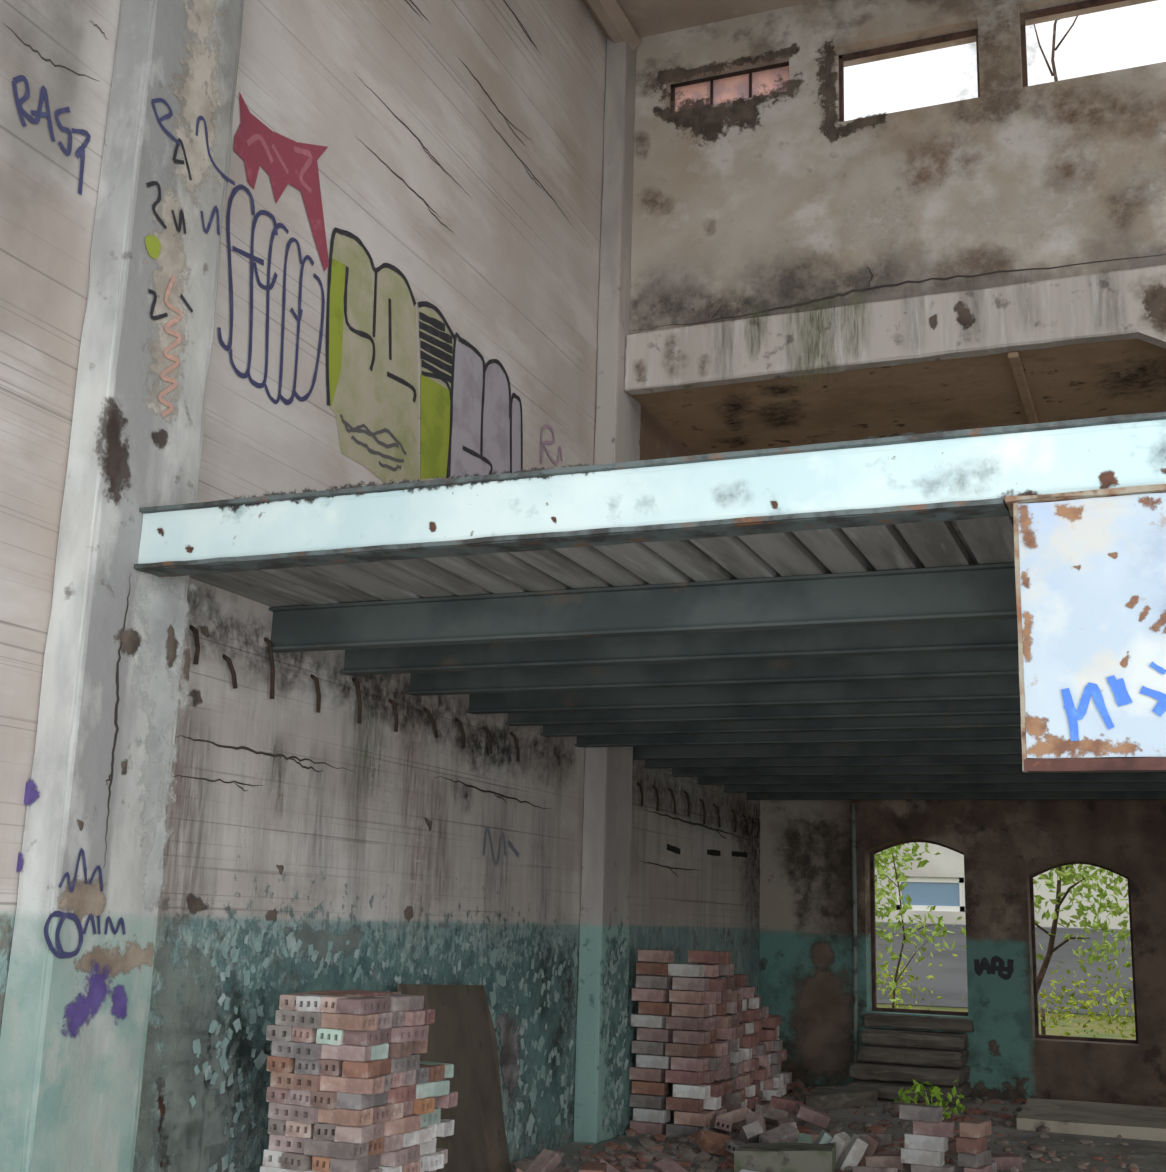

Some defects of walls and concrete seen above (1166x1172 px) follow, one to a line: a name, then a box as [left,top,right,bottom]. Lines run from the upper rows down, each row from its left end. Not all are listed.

peeling [144,0,222,422]
crack [633,254,1166,331]
rust [1098,471,1118,489]
rust [1003,490,1038,549]
rust [1056,504,1083,521]
rust [1139,496,1161,509]
rust [1022,611,1033,662]
rust [1126,596,1166,633]
rust [1025,714,1142,758]
peeling [74,575,578,1172]
peeling [58,878,106,922]